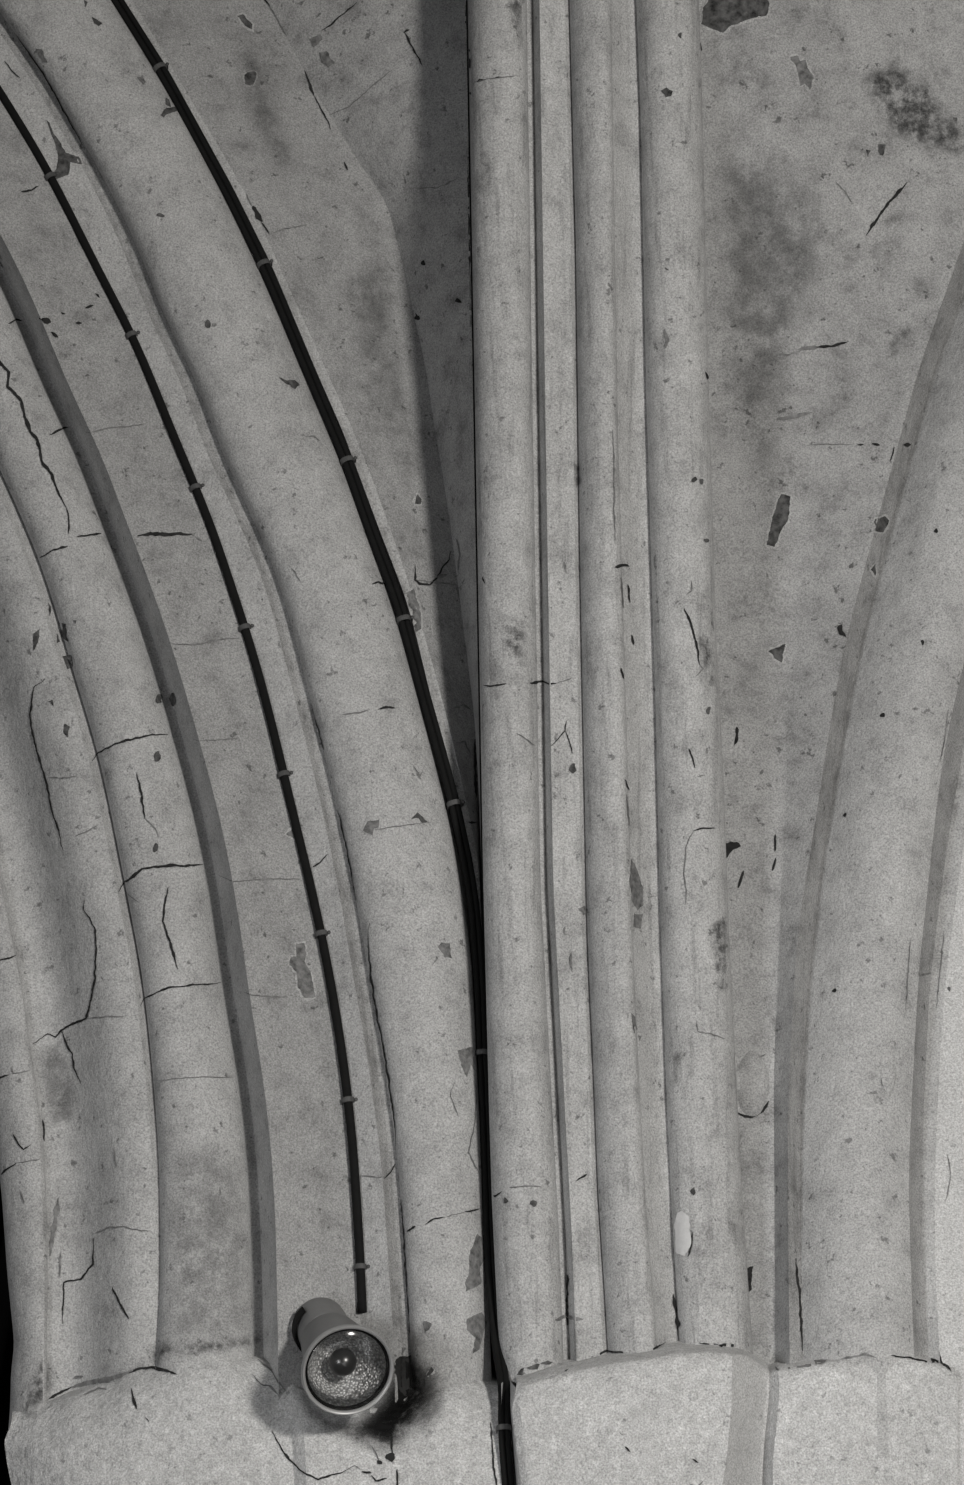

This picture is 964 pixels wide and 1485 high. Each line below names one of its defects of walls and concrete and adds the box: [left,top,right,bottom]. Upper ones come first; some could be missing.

spalling [699,0,773,35]
crack [0,361,70,534]
crack [29,680,98,849]
crack [125,888,178,969]
crack [33,903,122,1081]
crack [13,1120,45,1150]
crack [20,1192,147,1324]
crack [253,1359,286,1394]
crack [272,1432,398,1485]